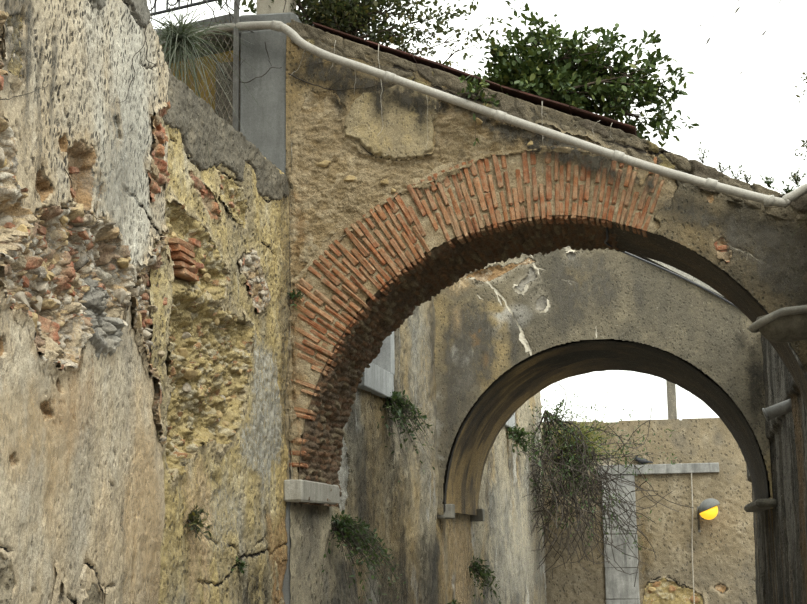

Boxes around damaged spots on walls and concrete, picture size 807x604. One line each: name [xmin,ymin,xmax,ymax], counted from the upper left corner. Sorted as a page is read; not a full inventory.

spalling [0,8,26,99]
spalling [0,68,611,492]
spalling [0,548,15,604]
spalling [51,559,106,604]
crack [200,538,285,587]